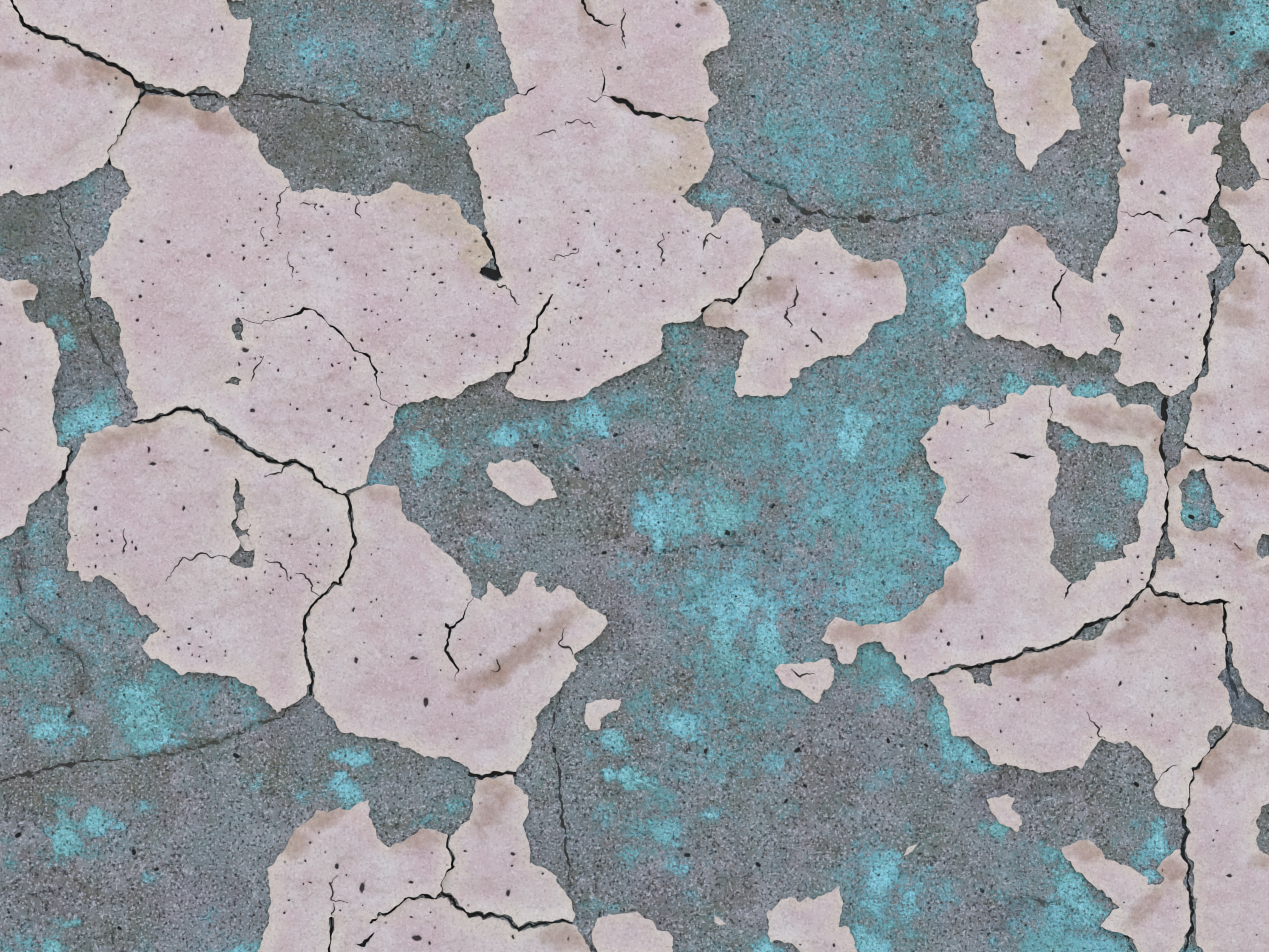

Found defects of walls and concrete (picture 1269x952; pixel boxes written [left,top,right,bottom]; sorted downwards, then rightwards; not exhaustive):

crack [10,0,465,165]
crack [539,78,707,135]
peeling [971,0,1097,171]
crack [1124,60,1269,265]
crack [242,307,400,408]
crack [1195,279,1216,379]
crack [0,186,357,784]
peeling [0,0,907,952]
peeling [774,79,1269,952]
crack [927,397,1269,699]
crack [328,687,575,952]
crack [1156,731,1227,952]